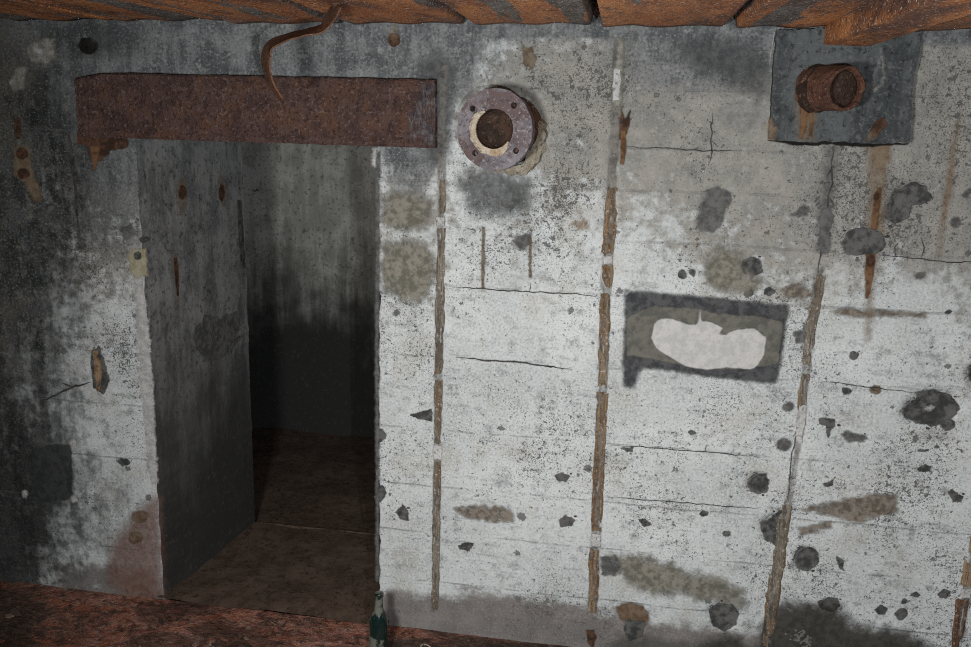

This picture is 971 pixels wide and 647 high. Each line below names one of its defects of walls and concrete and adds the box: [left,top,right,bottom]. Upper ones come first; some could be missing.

leakage [9,38,56,90]
rust [796,64,824,139]
leakage [129,249,158,483]
spalling [902,389,960,431]
rust [586,630,596,647]
leakage [702,637,744,647]
leakage [760,603,926,647]